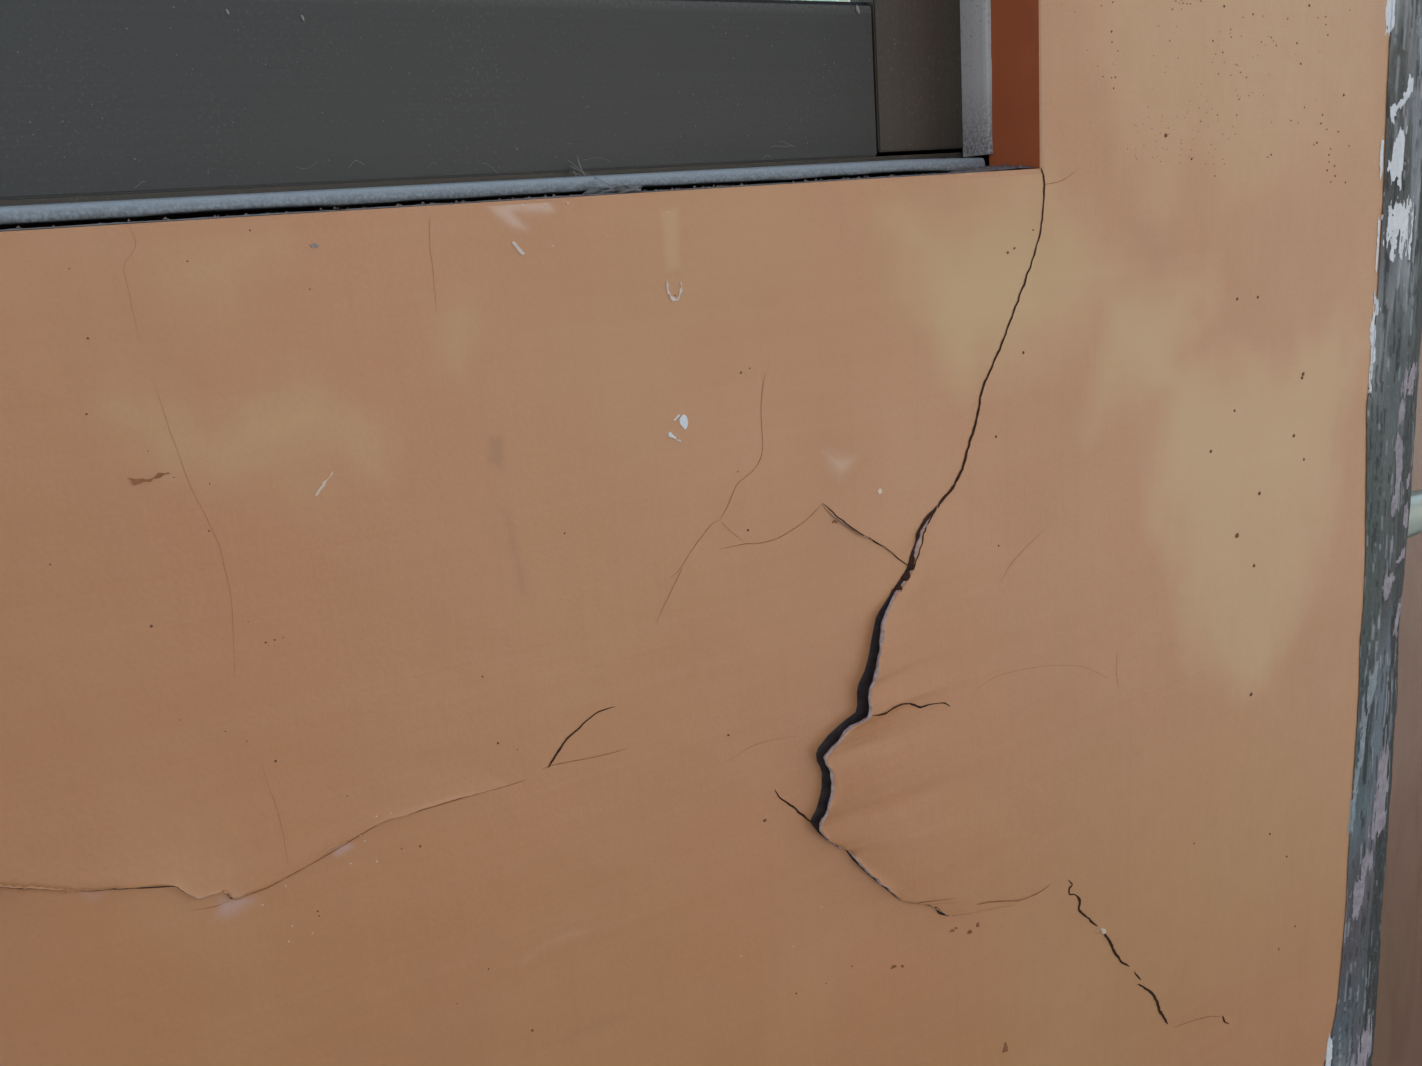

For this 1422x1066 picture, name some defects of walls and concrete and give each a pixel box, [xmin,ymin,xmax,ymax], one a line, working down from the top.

peeling [1385,0,1395,36]
peeling [1375,15,1422,272]
peeling [1368,290,1381,393]
peeling [1391,362,1417,528]
crack [657,168,1229,1028]
peeling [1382,548,1405,636]
crack [4,707,627,911]
peeling [1347,660,1390,922]
peeling [1325,1034,1333,1066]
peeling [1350,1015,1372,1066]